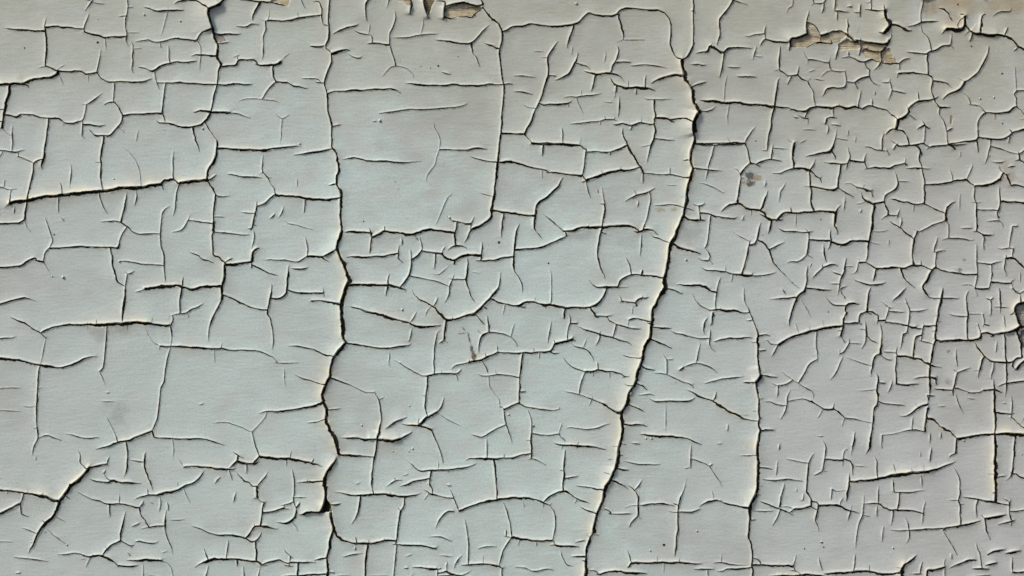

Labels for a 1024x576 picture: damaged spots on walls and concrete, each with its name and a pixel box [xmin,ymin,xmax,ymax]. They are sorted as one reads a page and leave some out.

peeling [446,3,481,18]
crack [746,15,909,96]
peeling [791,22,895,63]
crack [939,8,1024,51]
crack [0,0,324,381]
crack [780,172,906,278]
peeling [1016,304,1024,348]
crack [78,341,322,553]
crack [0,451,110,562]
crack [845,457,955,524]
crack [57,513,173,574]
crack [826,556,916,576]